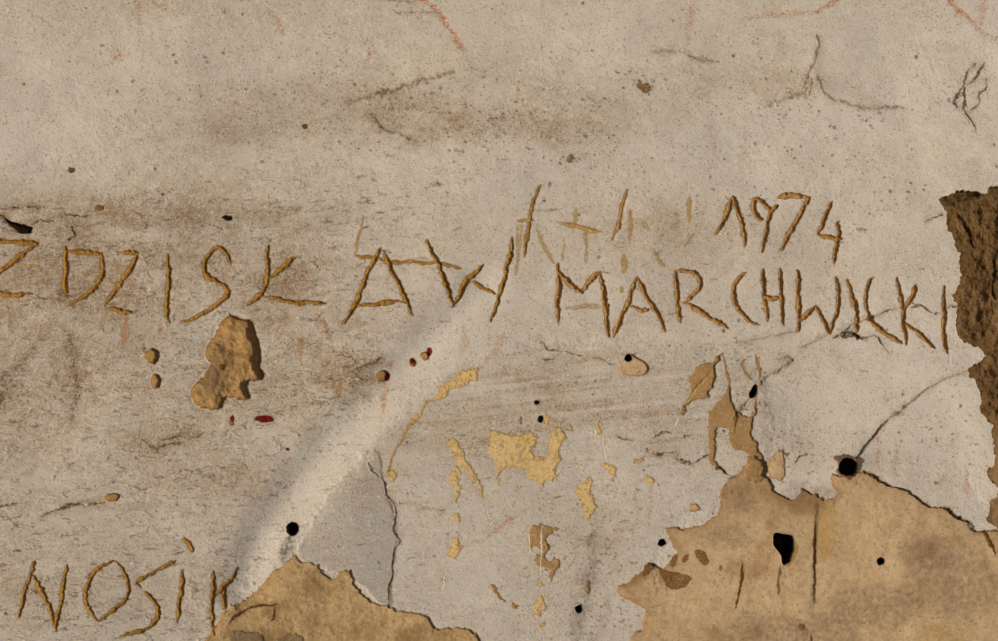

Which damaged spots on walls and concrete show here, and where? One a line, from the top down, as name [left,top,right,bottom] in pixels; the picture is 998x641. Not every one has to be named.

crack [952,63,986,128]
flaking render [190,315,264,410]
peeling [486,413,573,486]
flaking render [617,186,998,641]
flaking render [205,554,481,641]